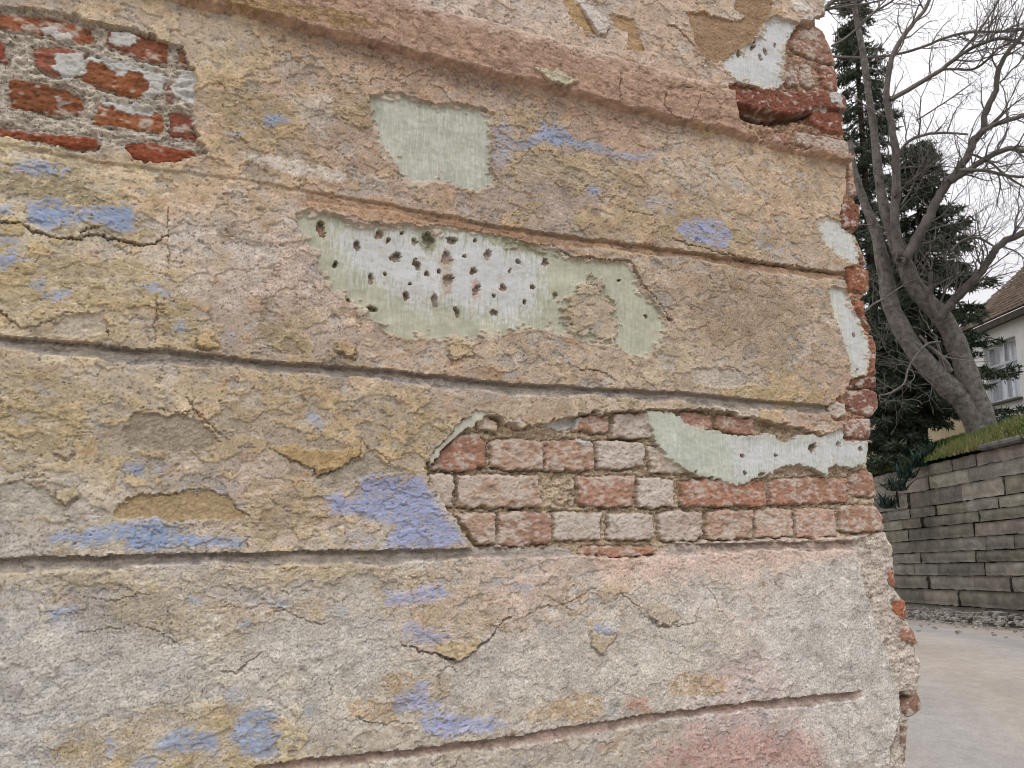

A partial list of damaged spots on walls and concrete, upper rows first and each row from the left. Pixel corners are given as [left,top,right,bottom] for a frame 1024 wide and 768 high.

flaking render [0,5,208,164]
peeling [370,90,499,193]
crack [0,203,171,345]
peeling [296,208,673,359]
flaking render [424,0,921,768]
peeling [114,489,251,523]
crack [401,584,724,700]